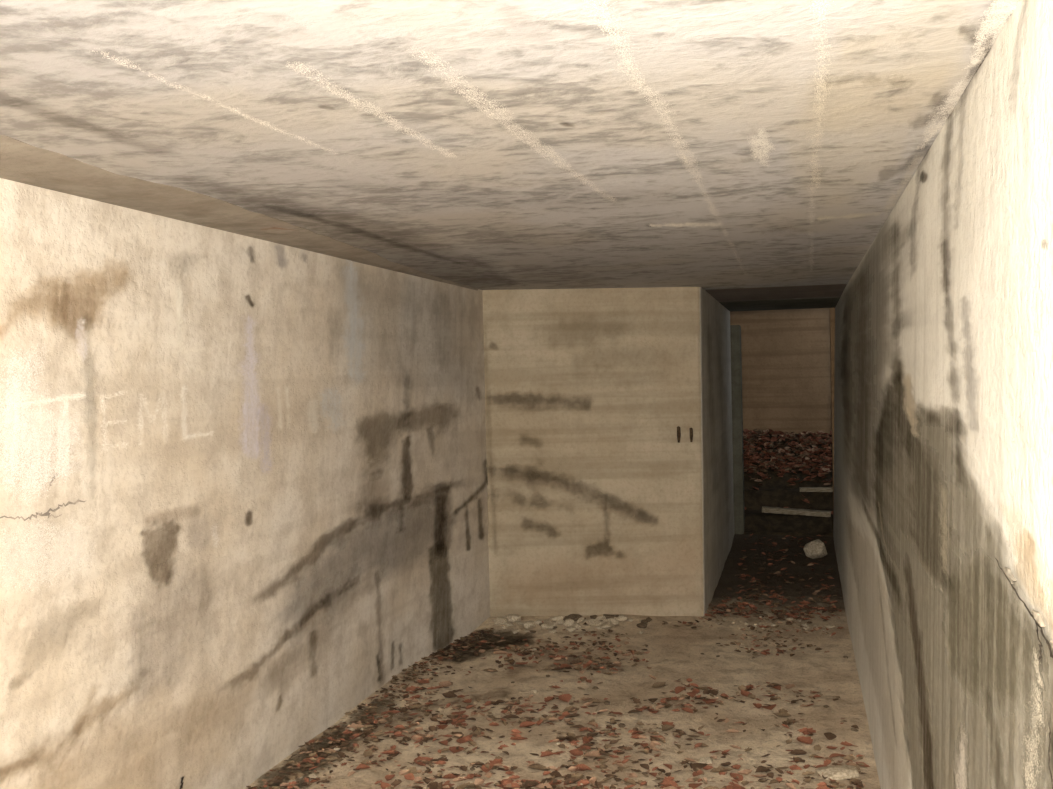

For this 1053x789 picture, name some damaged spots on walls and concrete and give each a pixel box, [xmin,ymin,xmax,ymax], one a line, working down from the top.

crack [0,473,85,521]
leakage [0,341,98,597]
leakage [431,549,530,662]
leakage [877,374,1053,789]
crack [995,558,1053,665]
crack [1045,720,1053,789]